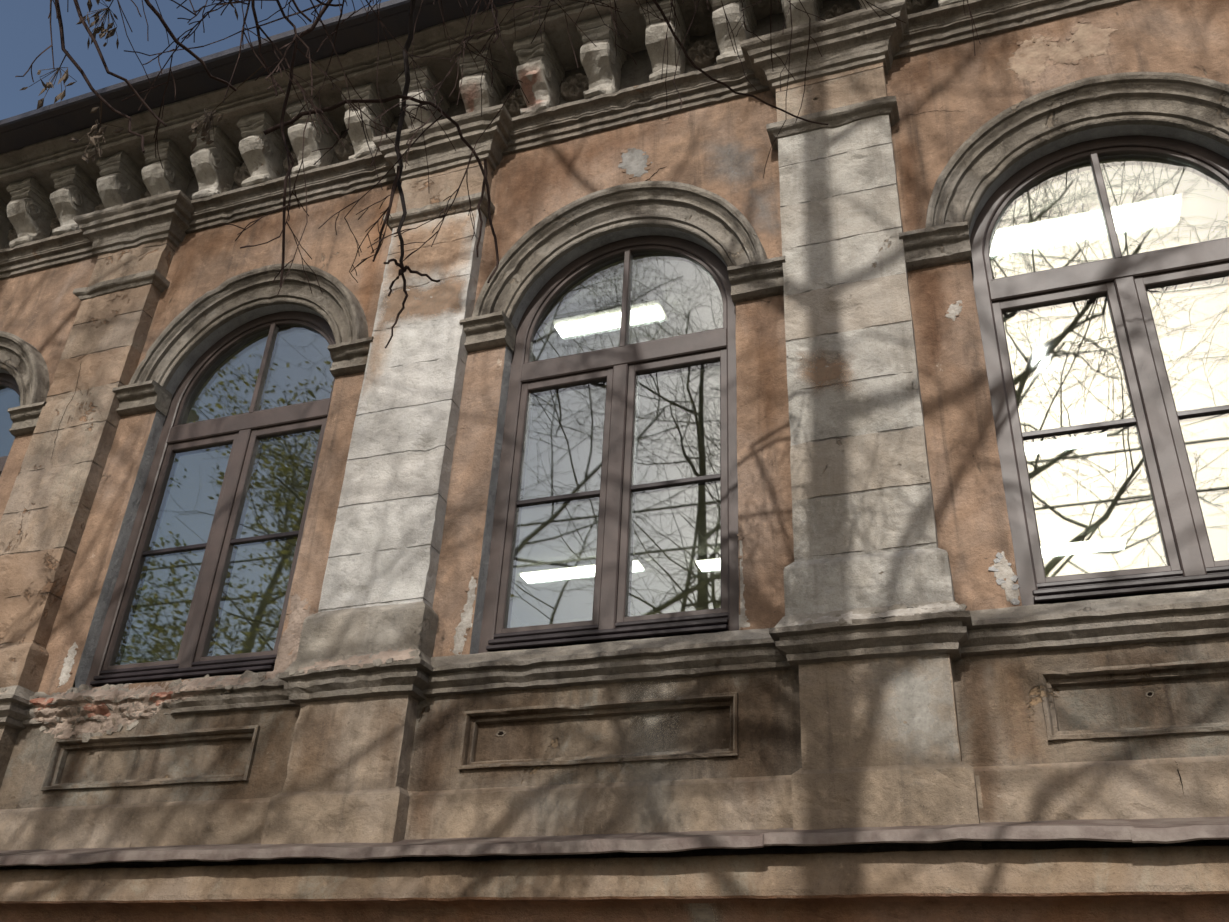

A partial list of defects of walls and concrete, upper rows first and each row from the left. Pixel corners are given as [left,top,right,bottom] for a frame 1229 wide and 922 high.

flaking render [988,551,1020,605]
flaking render [30,589,421,743]